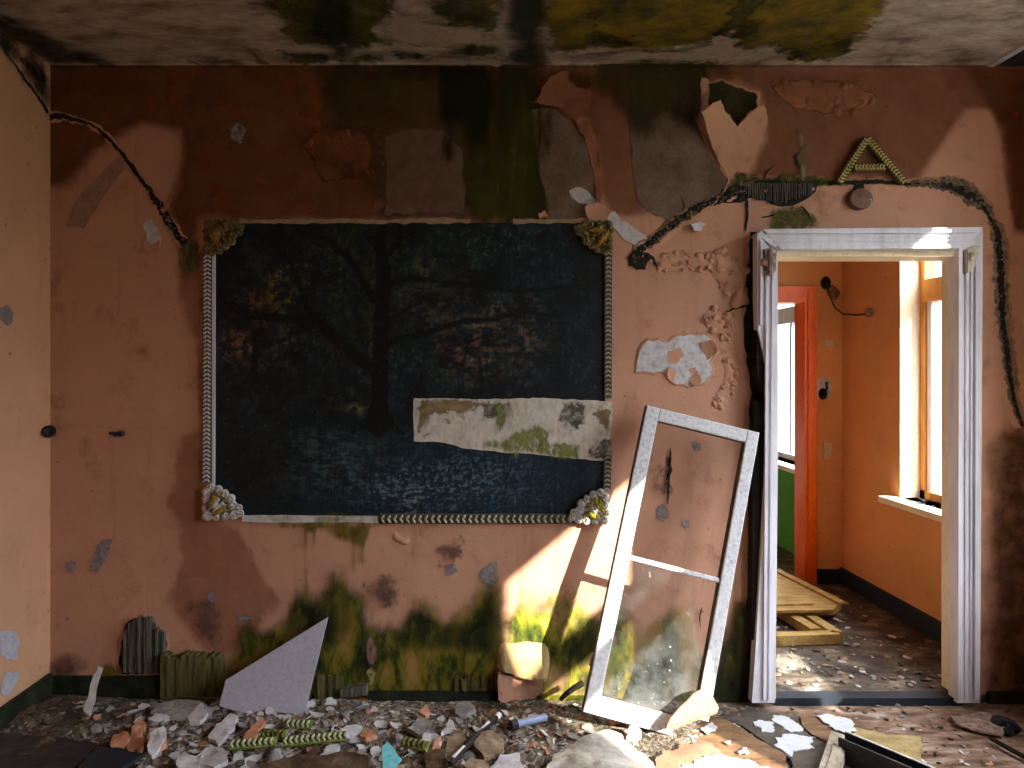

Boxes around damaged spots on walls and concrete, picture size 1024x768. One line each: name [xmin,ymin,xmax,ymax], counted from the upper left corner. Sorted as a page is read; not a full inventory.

crack [4,49,199,272]
leakage [50,0,1024,242]
peeling [530,30,794,246]
peeling [634,332,719,389]
crack [627,145,1024,429]
crack [664,447,672,505]
peeling [0,630,20,696]
mould [364,575,397,607]